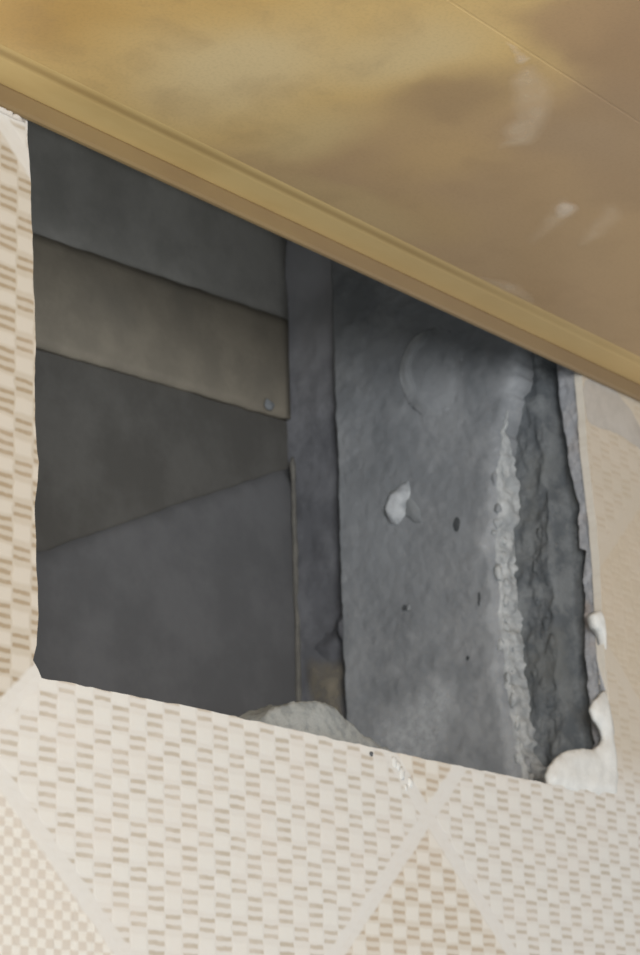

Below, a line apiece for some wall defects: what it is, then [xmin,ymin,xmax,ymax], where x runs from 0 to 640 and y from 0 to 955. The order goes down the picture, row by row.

peeling [385,480,423,525]
spalling [491,352,607,783]